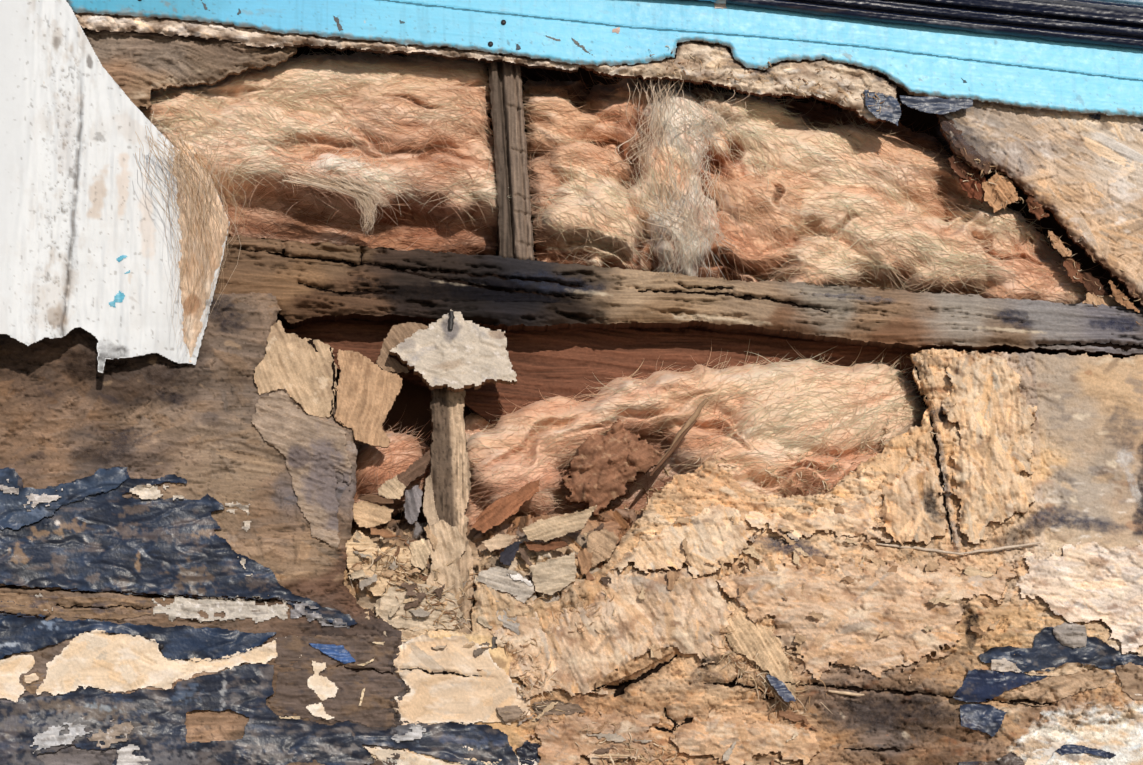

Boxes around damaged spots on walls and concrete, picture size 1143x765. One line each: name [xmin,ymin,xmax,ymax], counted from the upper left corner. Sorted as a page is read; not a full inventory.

spalling [74,0,1140,313]
peeling [0,479,63,511]
peeling [129,484,184,500]
peeling [225,501,251,532]
peeling [251,320,445,618]
crack [915,366,952,544]
peeling [365,351,1143,765]
peeling [152,595,350,628]
peeling [0,629,278,702]
peeling [297,636,356,720]
peeling [30,719,151,765]